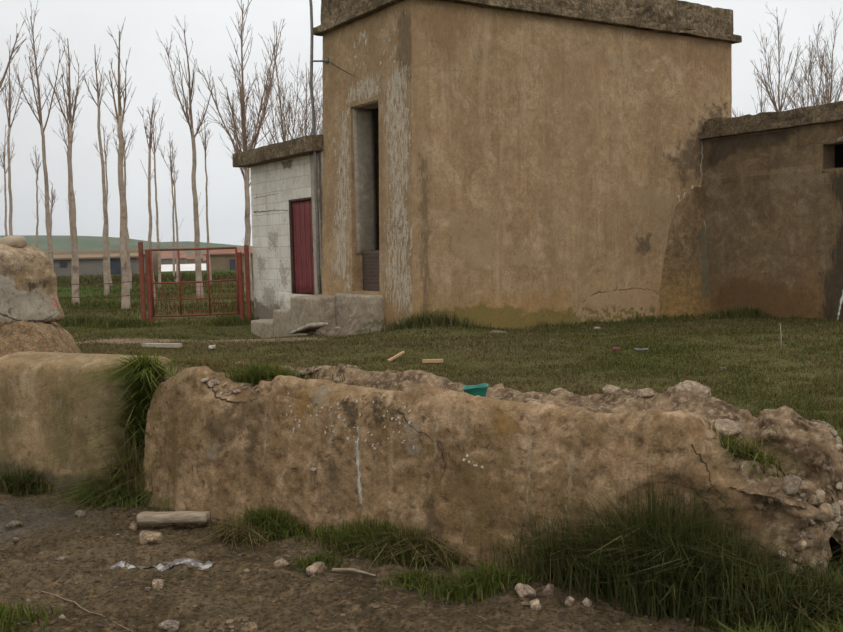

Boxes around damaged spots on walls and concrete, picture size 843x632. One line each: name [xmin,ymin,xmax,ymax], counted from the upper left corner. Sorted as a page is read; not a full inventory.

peeling [329,24,414,316]
damp [663,103,788,211]
damp [821,172,843,321]
crack [0,312,58,322]
crack [399,412,484,483]
crack [627,444,737,531]